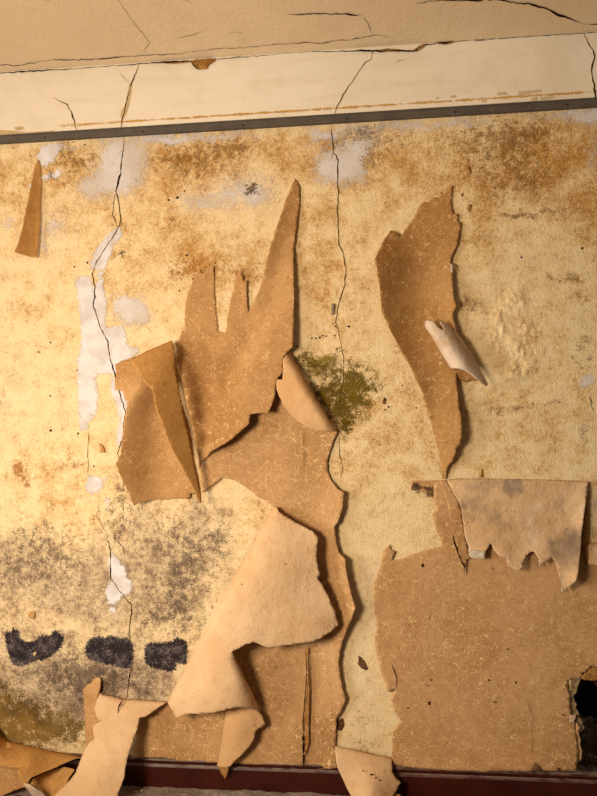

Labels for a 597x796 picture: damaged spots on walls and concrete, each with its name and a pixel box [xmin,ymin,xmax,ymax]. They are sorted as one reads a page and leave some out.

crack [417,0,597,97]
crack [1,0,436,459]
mould [294,345,384,443]
mould [0,528,74,581]
crack [96,495,133,699]
mould [136,521,229,632]
mould [0,647,153,748]
hole [573,678,597,718]